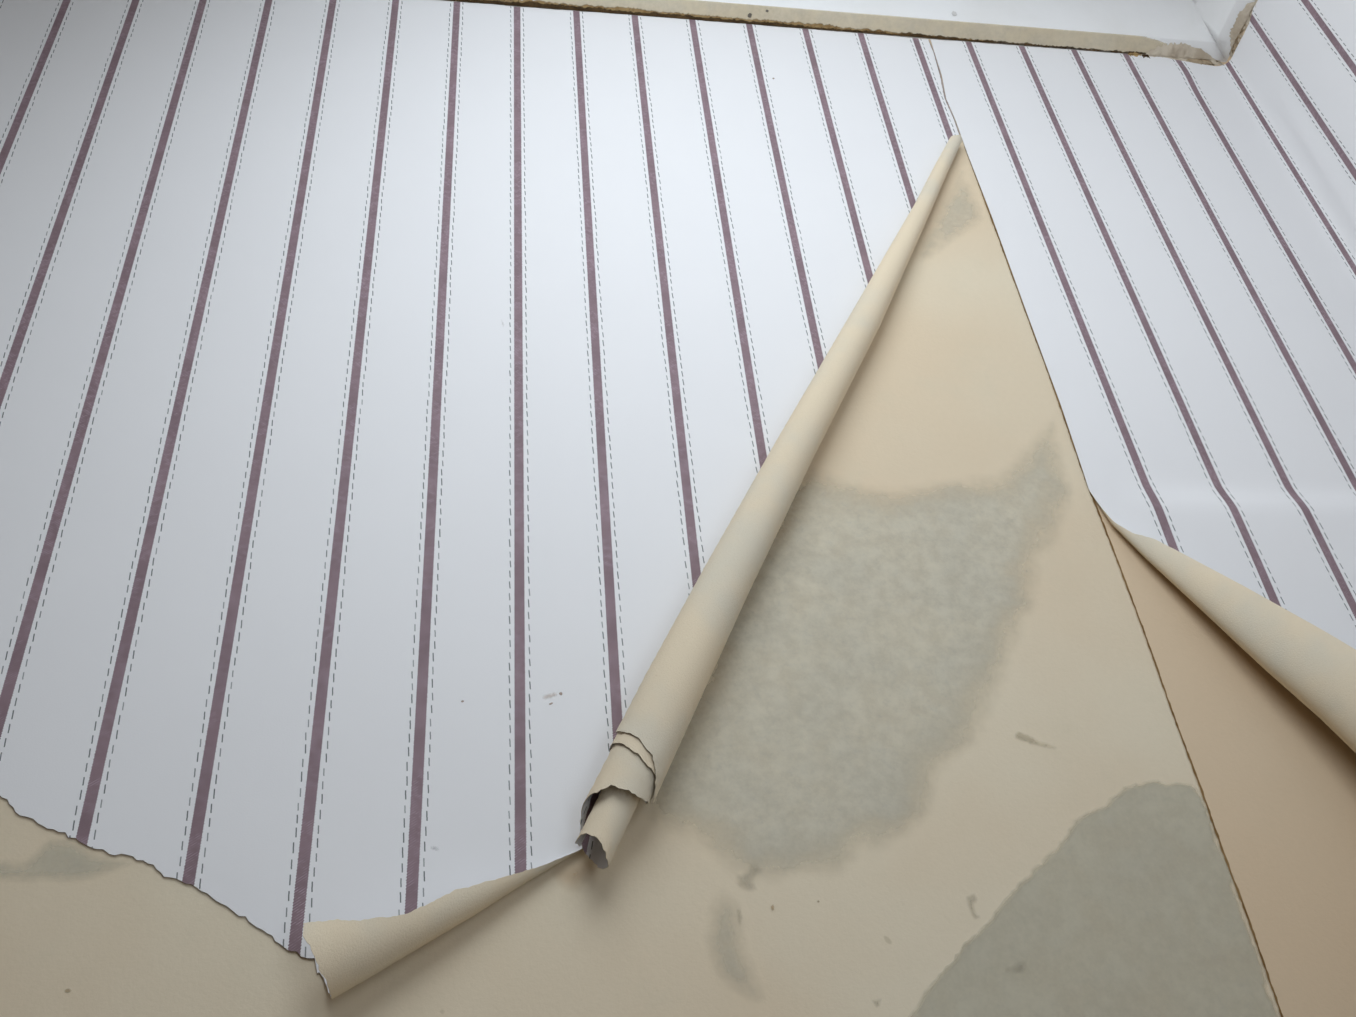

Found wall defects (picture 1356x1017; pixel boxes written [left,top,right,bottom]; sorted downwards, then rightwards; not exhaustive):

leakage [662,449,1059,881]